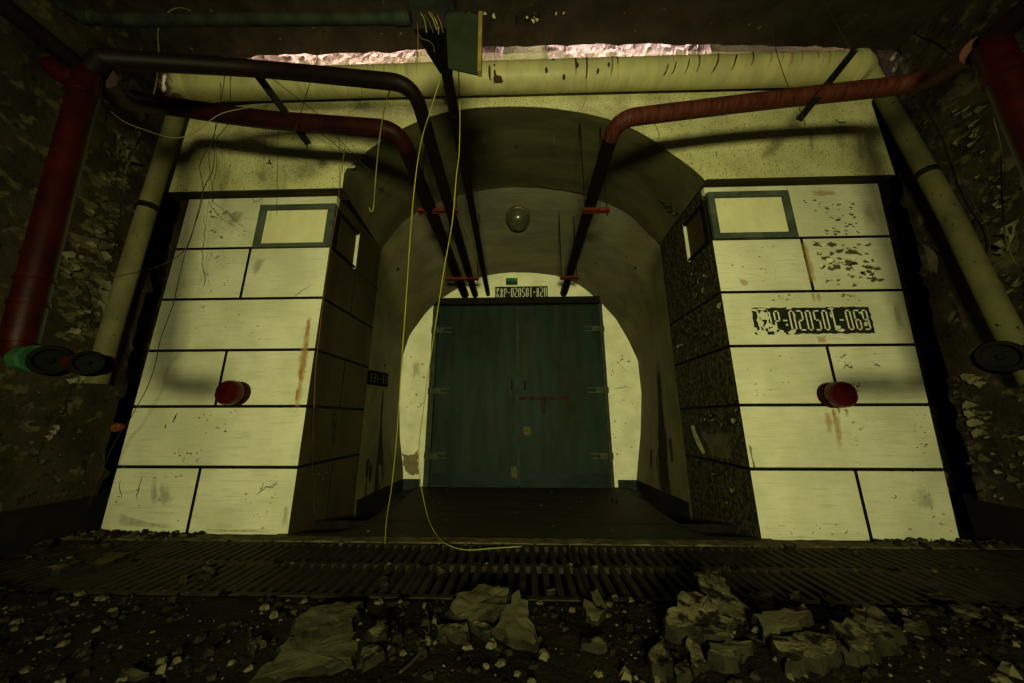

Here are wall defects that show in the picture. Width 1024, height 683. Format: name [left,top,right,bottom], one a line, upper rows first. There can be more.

peeling [803,198,884,301]